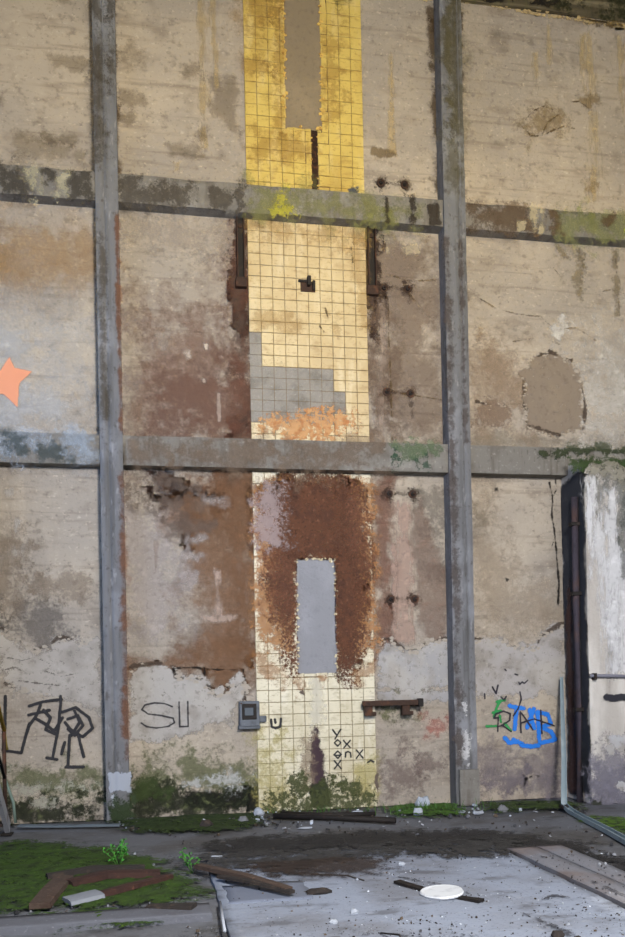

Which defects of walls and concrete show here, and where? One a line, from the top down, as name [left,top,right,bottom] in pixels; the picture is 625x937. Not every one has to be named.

spalling [280,0,326,190]
rust [226,219,249,338]
flaking render [471,349,587,439]
rust [169,471,446,690]
flaking render [375,634,448,704]
leakage [561,471,625,805]
leakage [182,767,259,811]
leakage [309,727,330,809]
spalling [461,729,473,766]